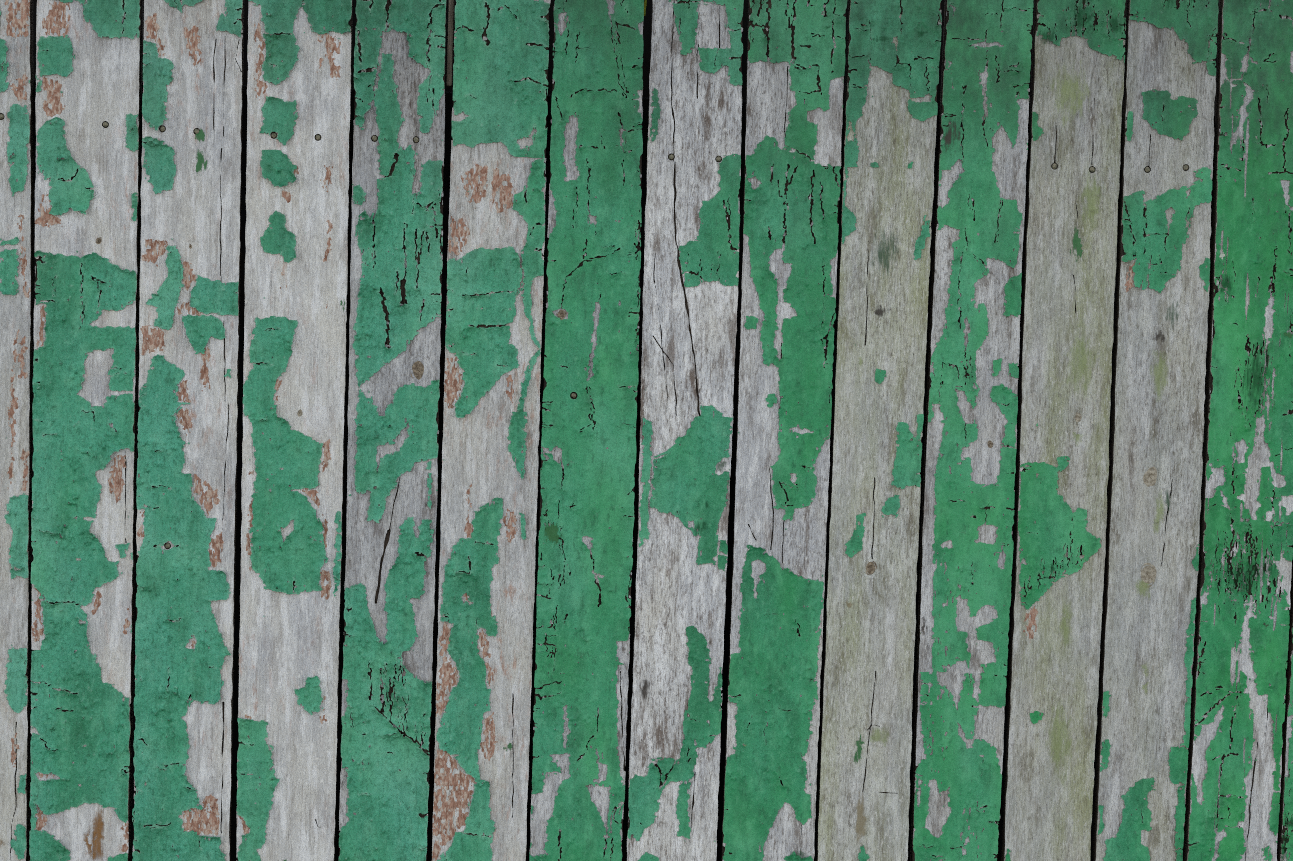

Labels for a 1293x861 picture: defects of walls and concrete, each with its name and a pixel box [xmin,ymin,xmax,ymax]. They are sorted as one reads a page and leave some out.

crack [357,0,391,73]
crack [426,2,579,62]
crack [896,0,1029,91]
crack [385,153,398,177]
crack [520,0,862,416]
crack [1226,99,1293,174]
crack [381,204,438,345]
crack [462,291,509,353]
crack [863,241,871,345]
peeling [0,0,243,861]
peeling [236,0,744,861]
peeling [722,0,1293,861]